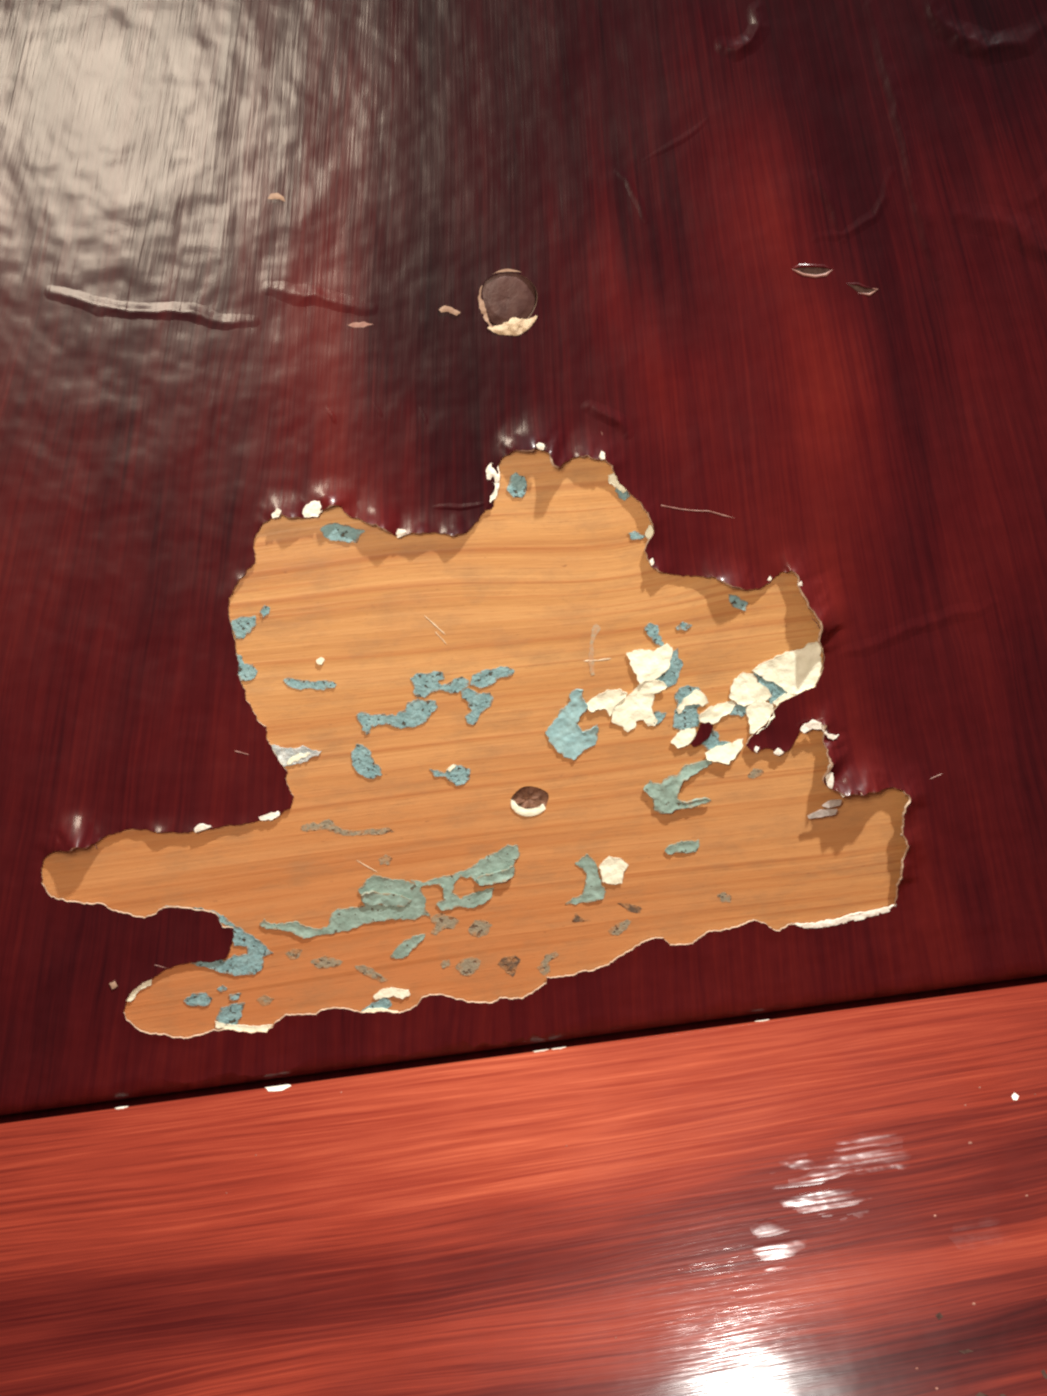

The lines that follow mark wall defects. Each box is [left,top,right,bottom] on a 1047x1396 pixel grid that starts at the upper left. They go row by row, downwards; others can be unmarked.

peeling [0,390,949,1092]